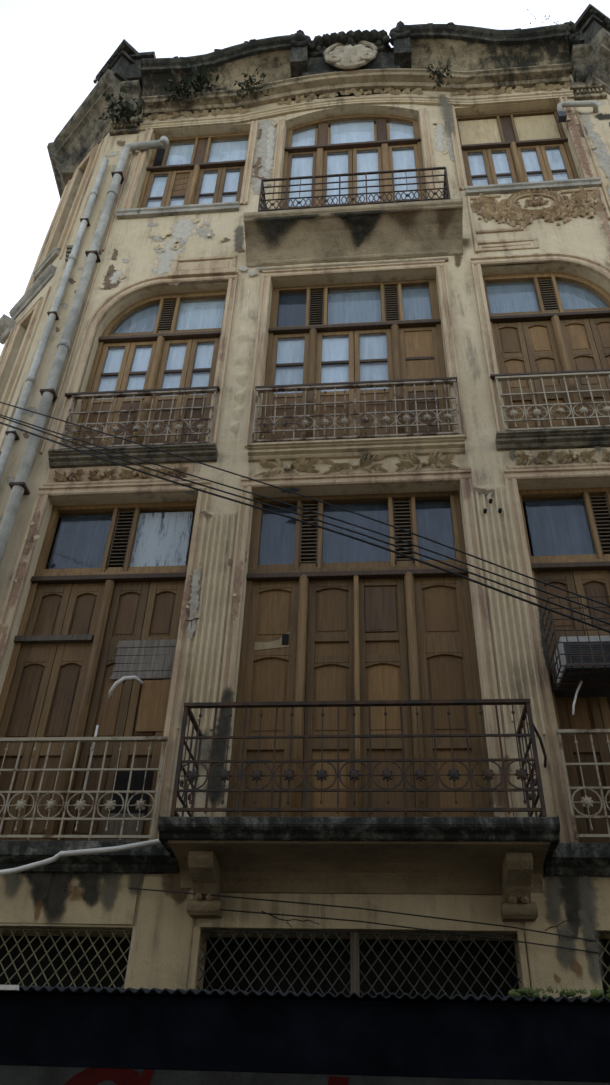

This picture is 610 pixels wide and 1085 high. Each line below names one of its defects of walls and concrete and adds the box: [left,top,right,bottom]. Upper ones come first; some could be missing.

peeling [250,118,277,195]
peeling [578,99,610,264]
peeling [98,248,129,290]
peeling [148,217,245,286]
leakage [235,226,244,252]
leakage [255,208,419,247]
leakage [436,209,456,233]
leakage [200,687,234,804]
leakage [5,872,144,923]
leakage [543,864,602,982]